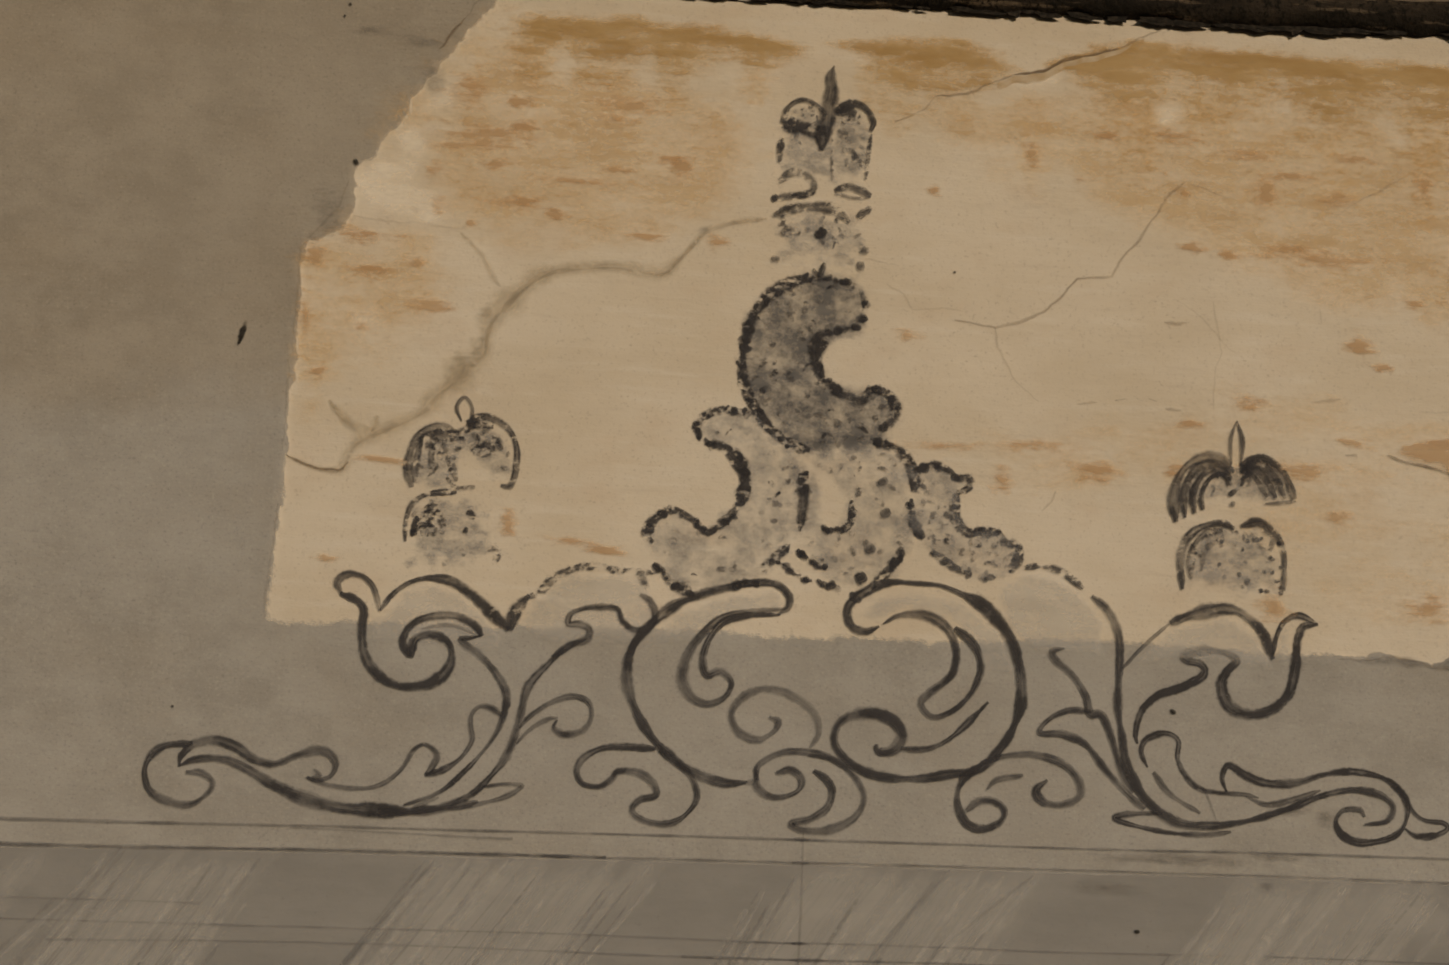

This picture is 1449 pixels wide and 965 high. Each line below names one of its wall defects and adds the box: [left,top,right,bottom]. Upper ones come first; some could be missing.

water stain [475,16,796,168]
water stain [842,39,1004,91]
water stain [1050,41,1449,144]
crack [444,270,559,390]
spalling [267,0,1449,665]